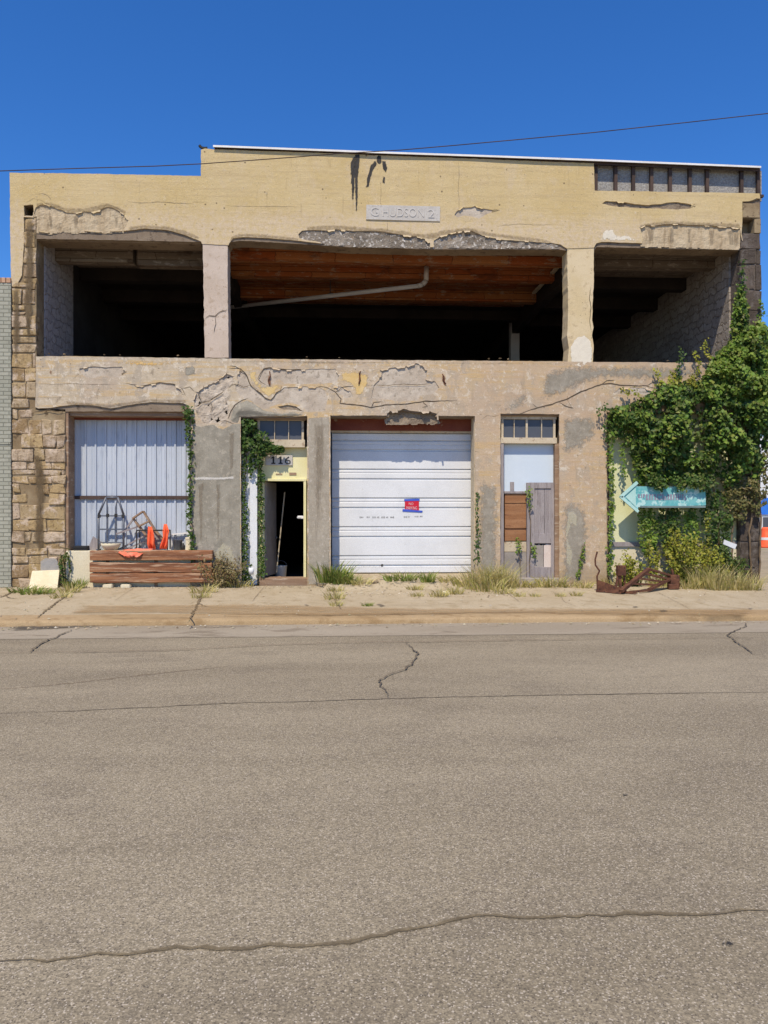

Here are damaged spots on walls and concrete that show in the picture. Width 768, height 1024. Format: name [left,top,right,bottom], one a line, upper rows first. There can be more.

flaking render [32,203,128,235]
spalling [299,229,560,249]
flaking render [455,206,499,219]
spalling [602,201,696,210]
flaking render [640,203,760,250]
flaking render [134,368,339,427]
flaking render [371,363,440,425]
crack [520,380,656,414]